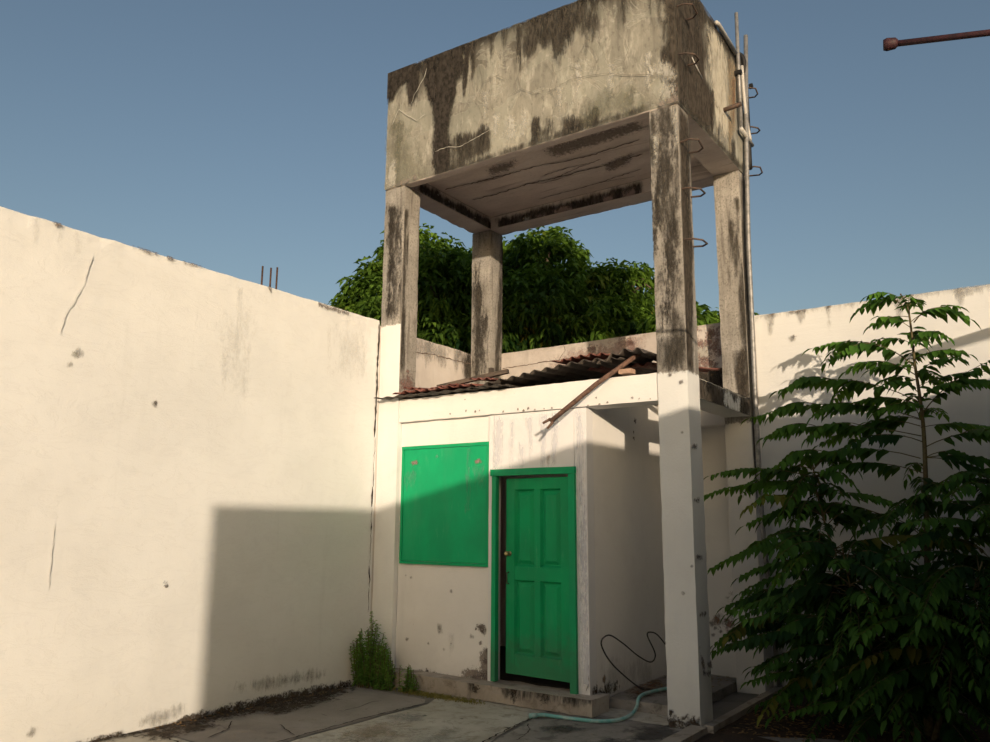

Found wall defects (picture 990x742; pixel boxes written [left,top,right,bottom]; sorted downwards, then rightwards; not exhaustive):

crack [445,139,642,200]
damp [386,0,758,500]
peeling [461,624,488,680]